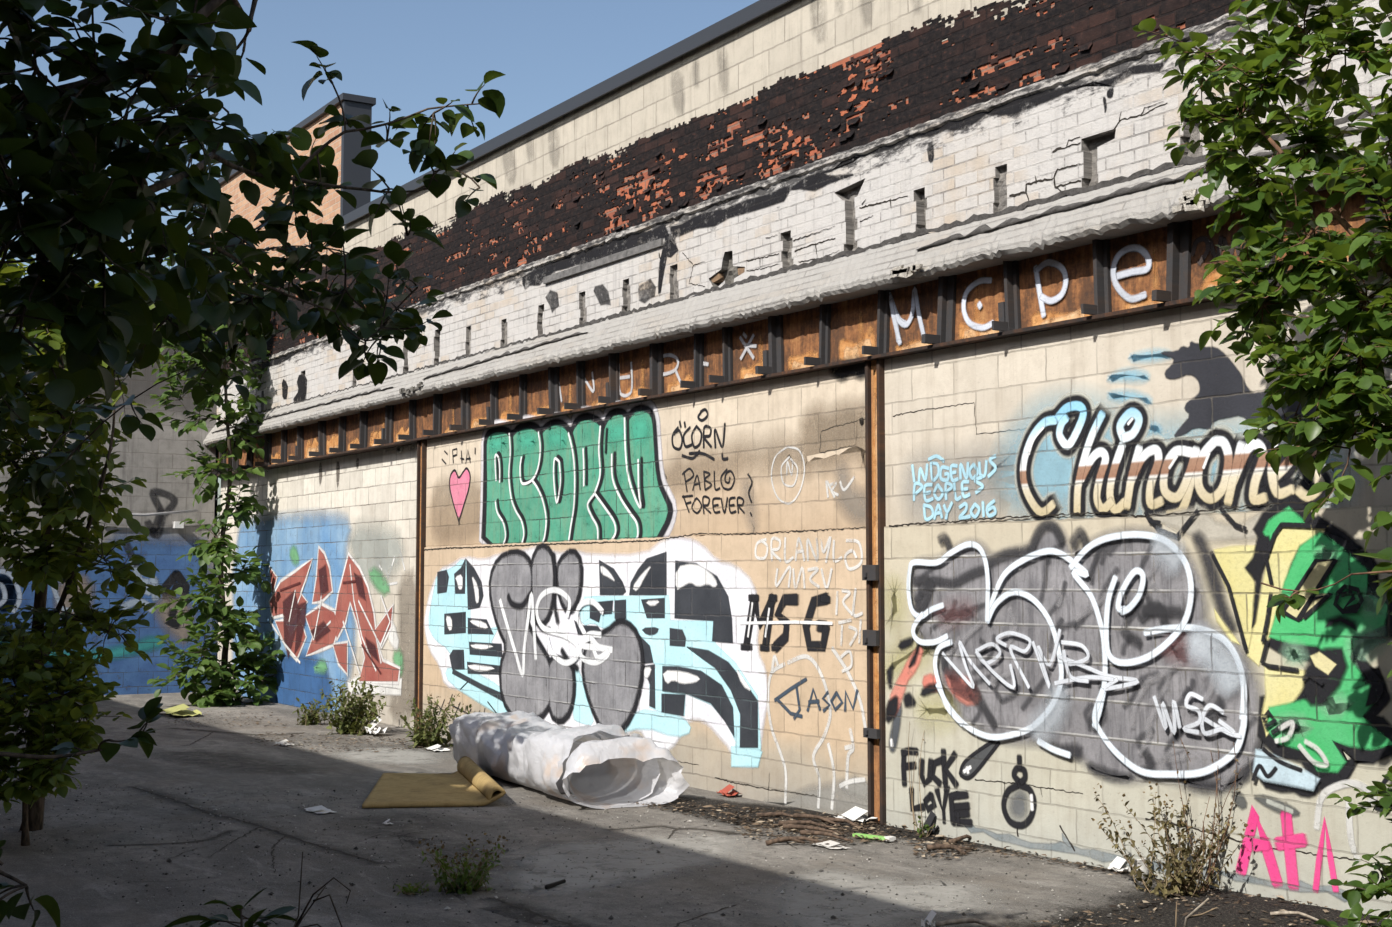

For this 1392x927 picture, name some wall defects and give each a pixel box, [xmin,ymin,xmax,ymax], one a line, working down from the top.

peeling [221,0,1245,369]
crack [212,101,1387,433]
rust [1125,255,1163,309]
rust [959,286,999,339]
rust [1032,310,1090,326]
rust [625,360,646,400]
rust [667,375,693,392]
rust [740,334,763,379]
rust [788,352,819,370]
rust [896,341,932,351]
rust [445,387,572,433]
rust [839,313,879,745]